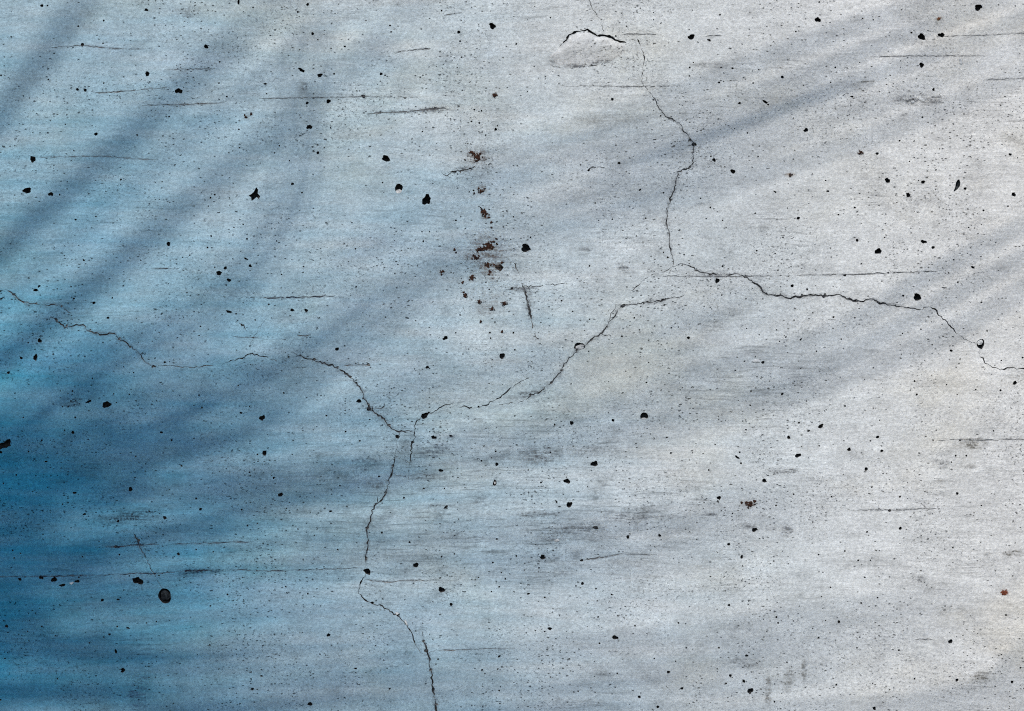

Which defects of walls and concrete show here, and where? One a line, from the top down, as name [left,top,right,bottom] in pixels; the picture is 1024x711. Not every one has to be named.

crack [97,68,218,106]
crack [262,96,457,114]
crack [610,33,1024,370]
rust [461,208,507,311]
crack [506,263,564,339]
crack [0,289,684,711]